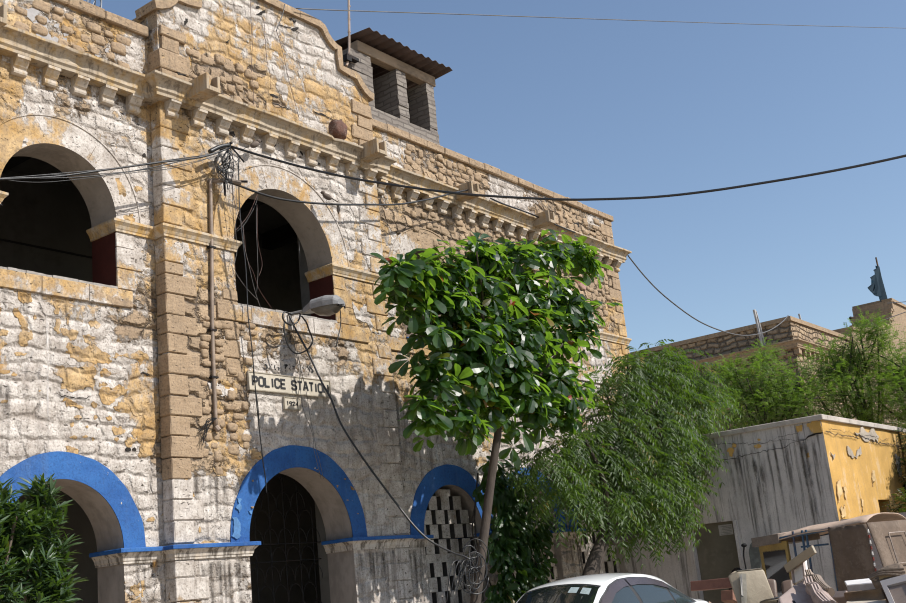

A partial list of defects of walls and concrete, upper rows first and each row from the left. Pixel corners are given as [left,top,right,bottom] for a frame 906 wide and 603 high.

peeling [33,17,69,42]
peeling [180,13,209,37]
spalling [189,47,238,93]
peeling [235,24,321,108]
peeling [0,287,37,376]
peeling [237,336,257,358]
peeling [51,302,158,458]
peeling [207,379,238,396]
peeling [796,420,823,434]
peeling [847,426,879,459]